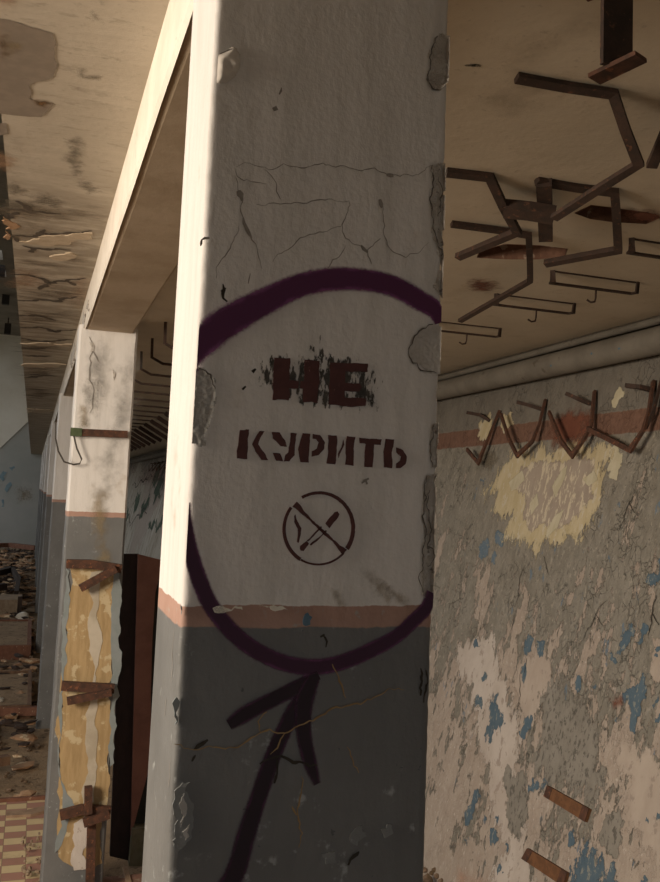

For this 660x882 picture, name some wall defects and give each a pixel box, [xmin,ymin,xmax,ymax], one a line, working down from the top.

spalling [427,33,450,91]
crack [216,162,432,302]
corrosion [472,280,493,291]
corrosion [627,210,660,221]
spalling [192,367,217,447]
flaking render [477,411,514,441]
flaking render [611,386,624,408]
spalling [418,422,439,600]
flaking render [478,440,622,565]
peeling [55,568,122,870]
crack [175,634,429,848]
peeling [456,622,660,882]